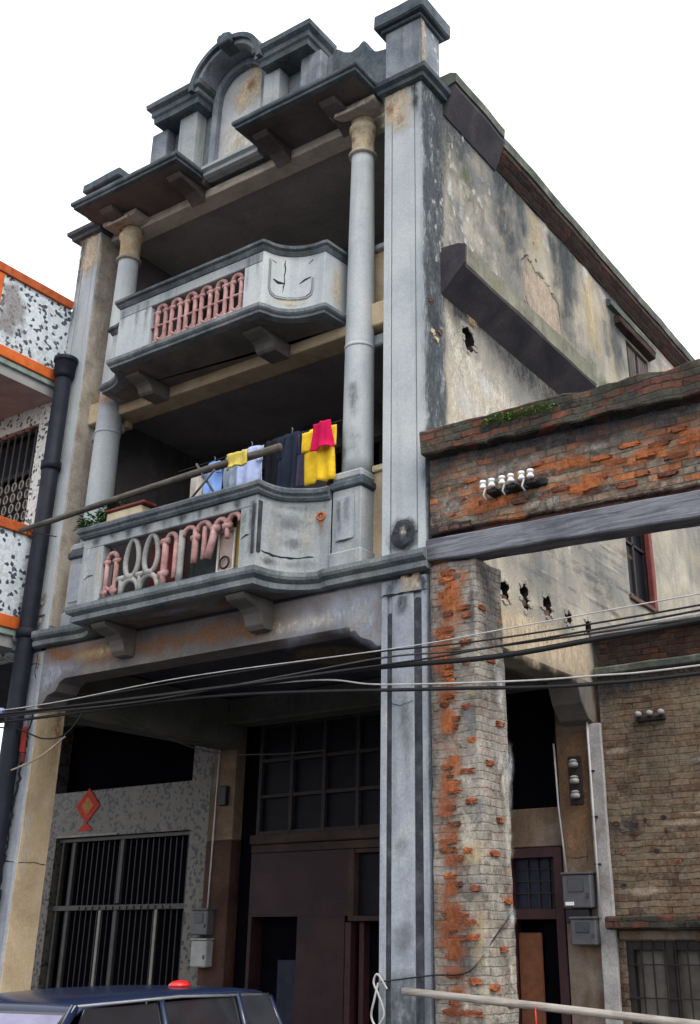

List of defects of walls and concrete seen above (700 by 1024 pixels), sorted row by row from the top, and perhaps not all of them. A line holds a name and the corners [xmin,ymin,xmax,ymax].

crack [273,260,310,293]
water stain [421,82,623,431]
flaking render [521,242,561,335]
flaking render [427,297,513,423]
flaking render [430,425,700,537]
flaking render [500,575,592,679]
flaking render [382,569,512,1018]